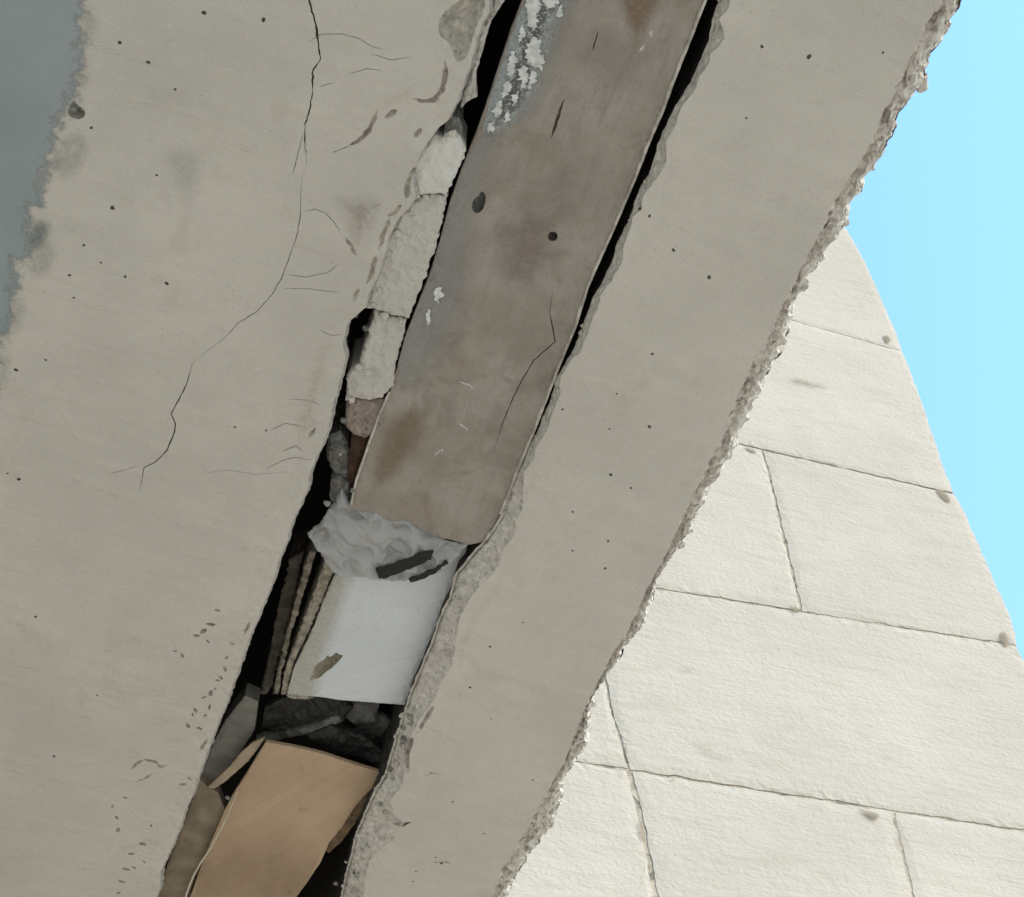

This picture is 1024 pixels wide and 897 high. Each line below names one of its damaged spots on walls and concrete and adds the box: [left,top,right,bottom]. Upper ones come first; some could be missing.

crack [140,0,339,488]
spalling [157,0,493,897]
crack [494,292,556,452]
spalling [341,0,730,897]